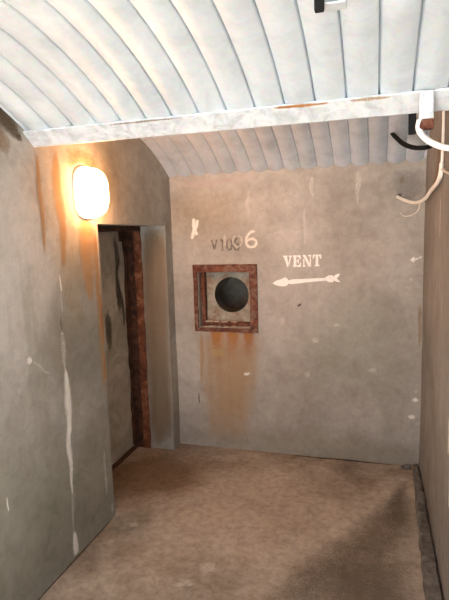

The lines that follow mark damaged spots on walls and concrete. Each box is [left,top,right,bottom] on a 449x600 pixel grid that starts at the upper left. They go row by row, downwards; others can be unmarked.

corrosion [35,158,46,255]
corrosion [51,148,99,267]
corrosion [78,219,106,393]
water stain [61,331,79,555]
corrosion [195,320,262,448]